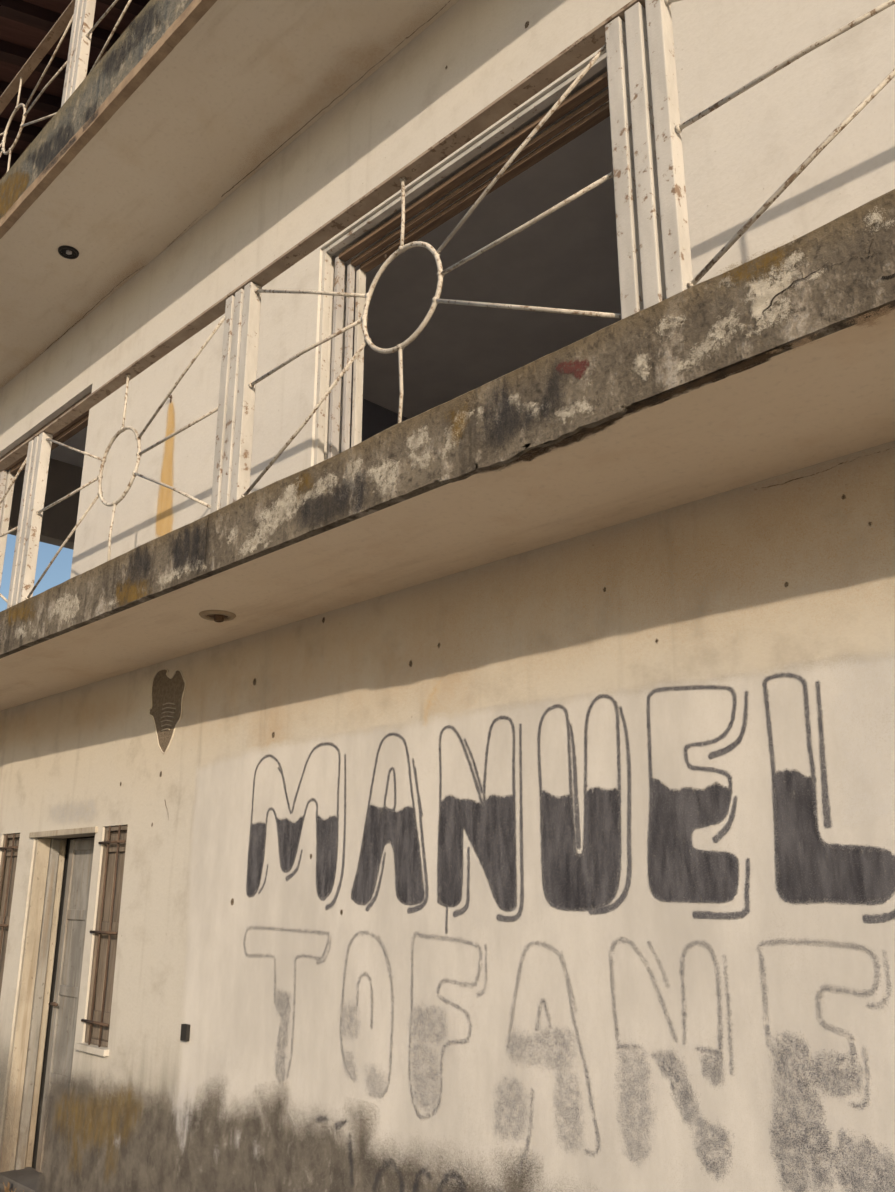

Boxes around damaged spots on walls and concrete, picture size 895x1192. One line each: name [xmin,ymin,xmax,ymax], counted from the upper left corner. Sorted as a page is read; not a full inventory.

water stain [99,3,162,79]
water stain [26,100,99,178]
peeling [863,205,894,233]
peeling [656,312,686,337]
peeling [674,235,827,373]
water stain [479,358,567,460]
peeling [506,371,599,423]
peeling [631,352,651,381]
water stain [296,469,373,530]
water stain [127,545,153,584]
water stain [168,518,210,576]
water stain [35,1063,599,1192]